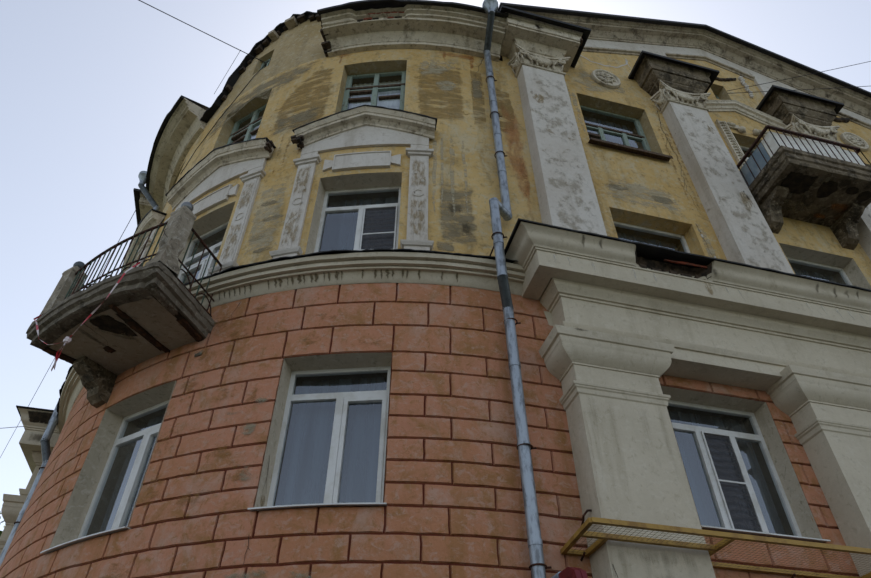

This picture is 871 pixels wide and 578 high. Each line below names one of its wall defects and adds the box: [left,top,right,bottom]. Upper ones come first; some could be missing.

peeling [209,16,334,153]
peeling [414,60,486,121]
peeling [496,94,514,131]
spalling [780,172,838,199]
spalling [635,224,716,279]
spalling [82,303,170,353]